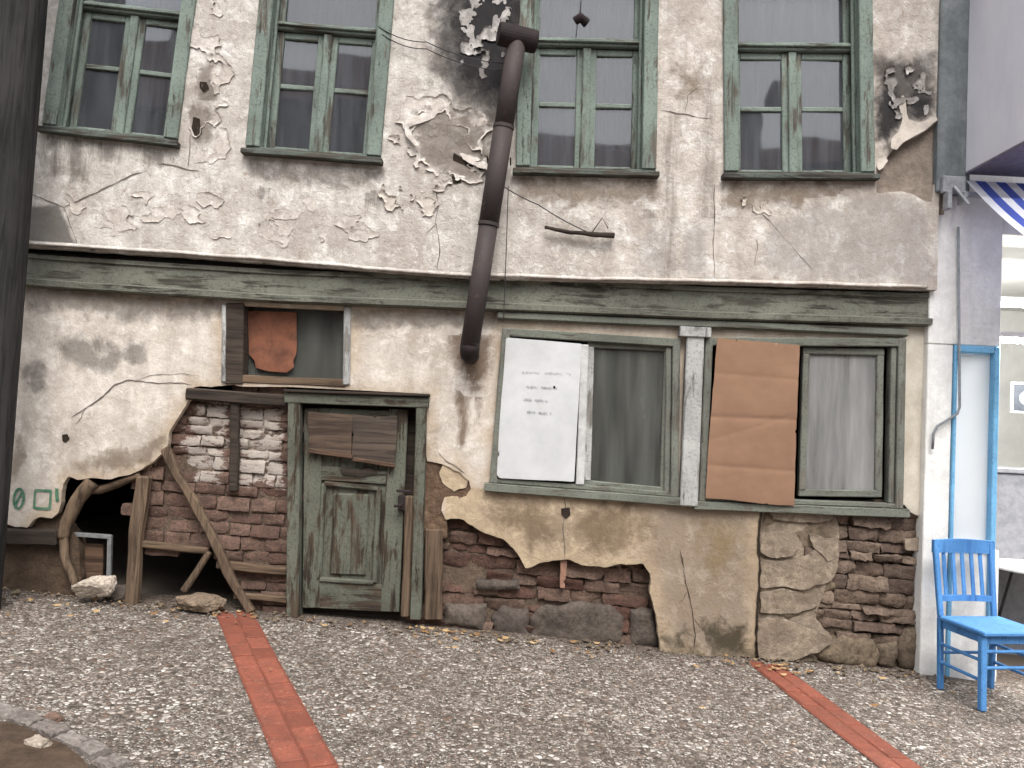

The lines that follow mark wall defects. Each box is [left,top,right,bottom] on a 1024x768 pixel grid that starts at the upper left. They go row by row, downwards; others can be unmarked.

crack [33,134,198,243]
peeling [95,191,225,236]
peeling [188,23,235,164]
peeling [334,213,379,242]
peeling [378,93,493,217]
peeling [459,0,511,79]
peeling [876,64,944,215]
crack [72,373,194,423]
flaking render [2,385,288,613]
flaking render [404,457,659,647]
crack [679,551,704,652]
flaking render [756,507,919,670]